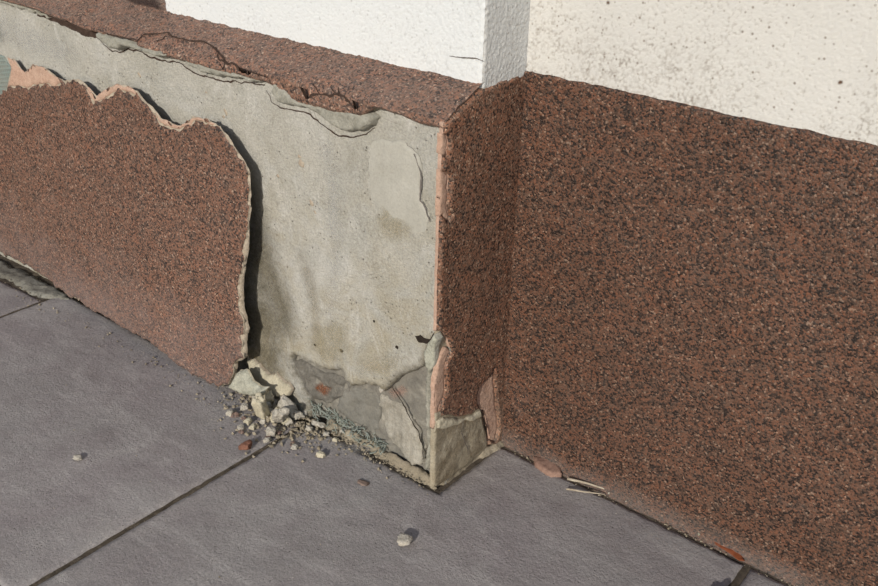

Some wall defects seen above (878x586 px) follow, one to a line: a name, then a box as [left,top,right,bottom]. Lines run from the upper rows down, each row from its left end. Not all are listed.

crack [97,29,374,138]
flaking render [0,0,497,488]